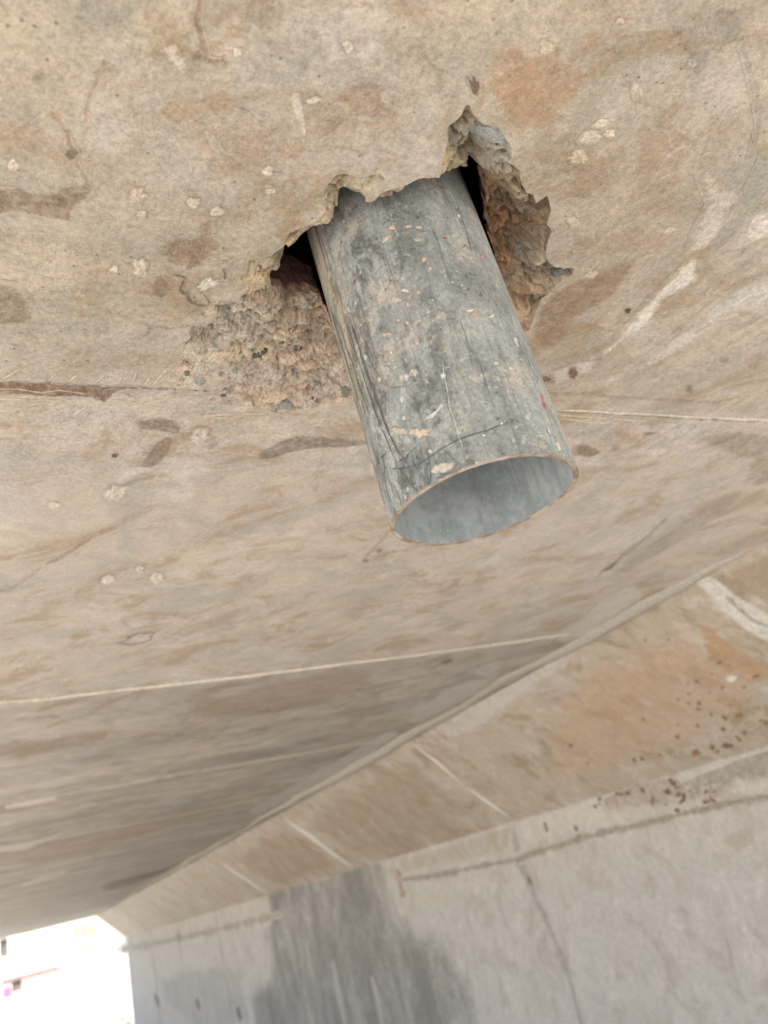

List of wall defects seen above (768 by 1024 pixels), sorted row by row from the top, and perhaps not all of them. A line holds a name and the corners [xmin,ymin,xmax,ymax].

flaking render [261,164,277,197]
spalling [170,174,404,413]
spalling [440,73,599,332]
corrosion [525,606,768,815]